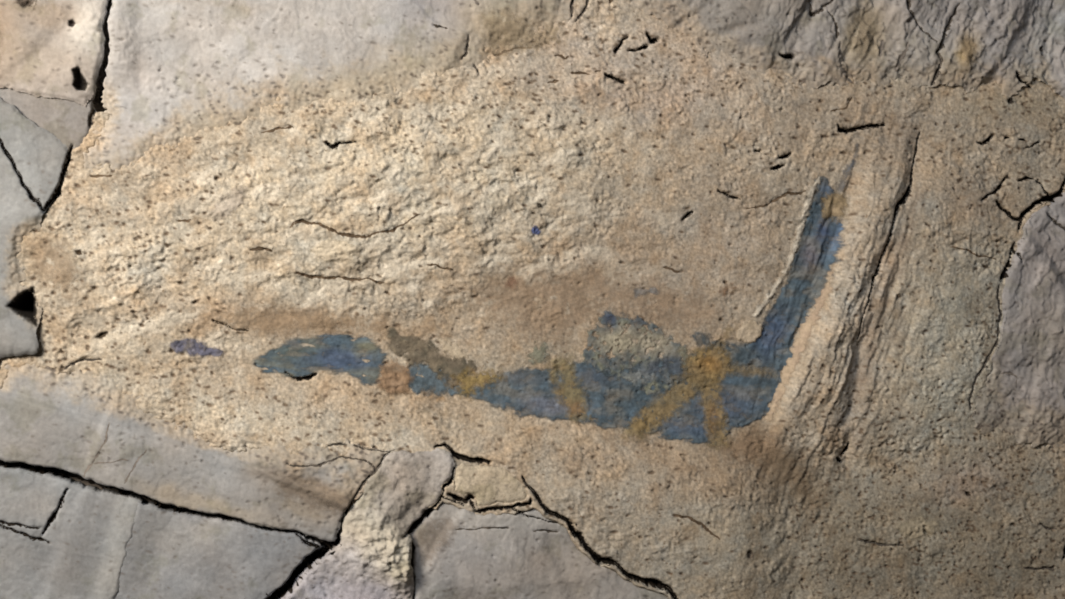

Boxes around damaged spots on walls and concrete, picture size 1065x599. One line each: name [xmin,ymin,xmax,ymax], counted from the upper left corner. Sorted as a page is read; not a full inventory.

crack [0,53,112,212]
spalling [211,186,245,221]
spalling [311,239,360,261]
peeling [408,361,465,396]
spalling [439,339,466,359]
crack [857,132,920,339]
crack [952,176,1065,410]
crack [0,422,231,543]
crack [266,442,395,599]
spalling [454,463,527,506]
crack [425,444,679,599]
spalling [896,516,938,539]